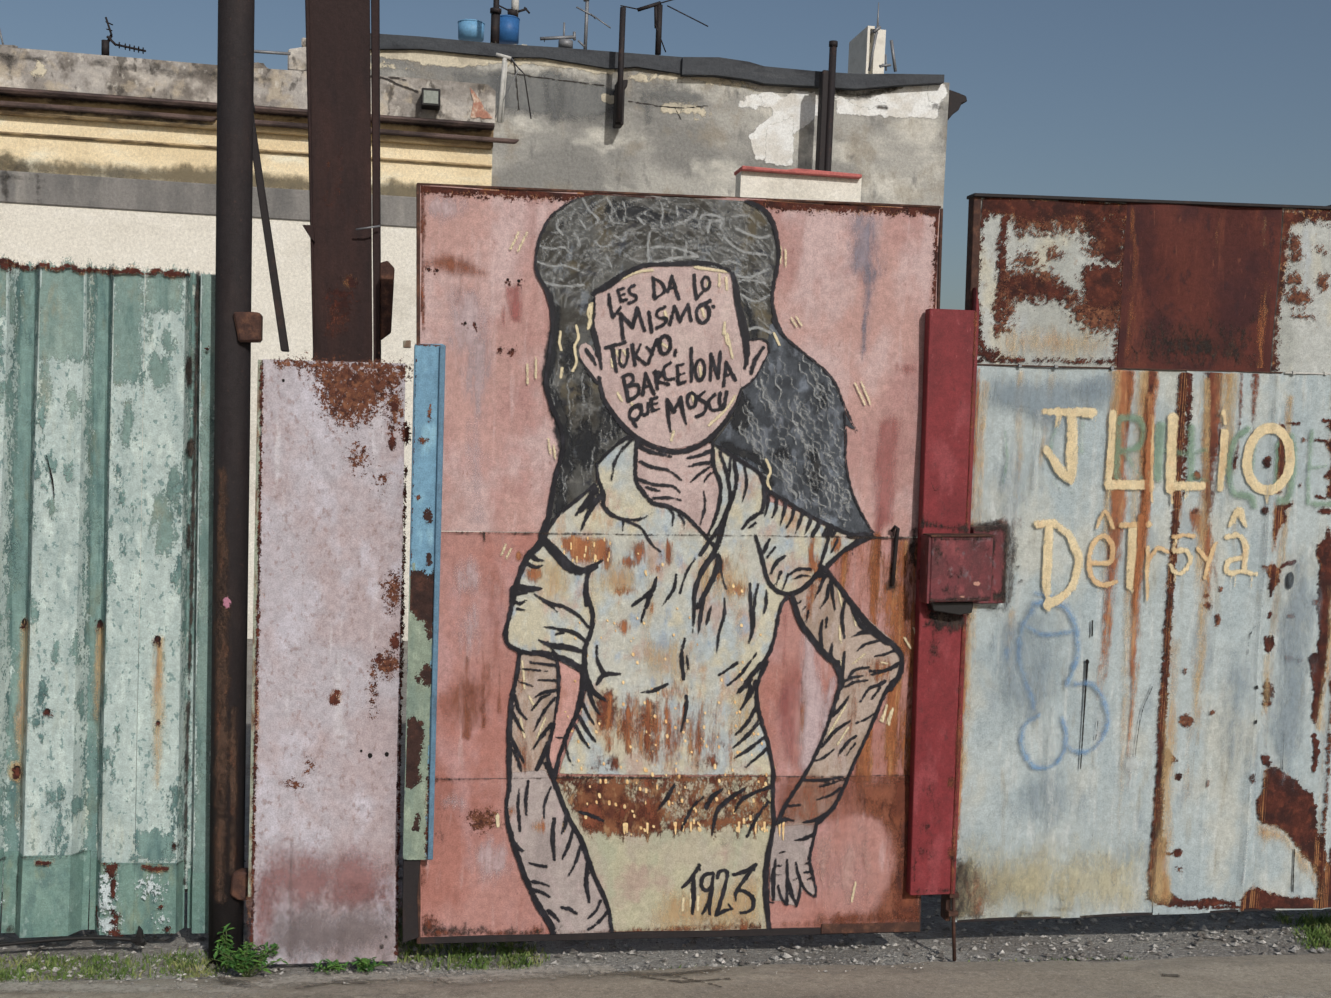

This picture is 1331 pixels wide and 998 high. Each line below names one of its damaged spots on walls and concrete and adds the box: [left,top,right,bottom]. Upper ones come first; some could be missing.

corrosion [0,258,200,885]
peeling [0,256,215,936]
corrosion [95,862,123,937]
corrosion [213,186,661,956]
corrosion [514,197,1331,924]